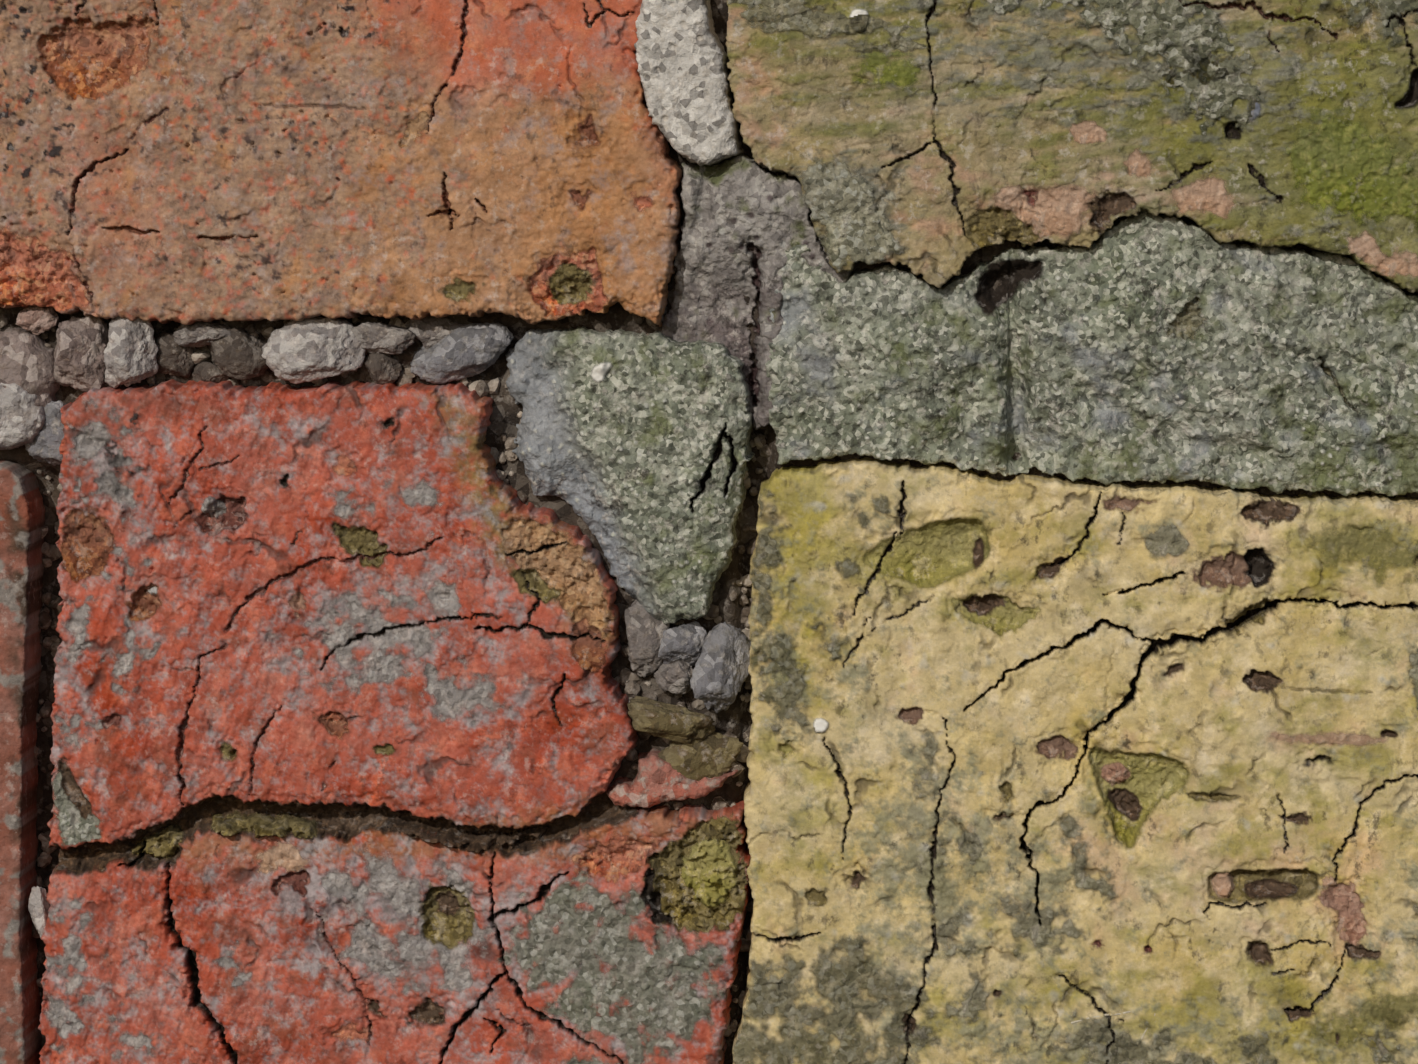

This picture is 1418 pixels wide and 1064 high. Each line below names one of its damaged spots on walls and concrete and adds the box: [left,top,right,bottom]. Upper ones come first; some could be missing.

crack [428,0,469,131]
crack [584,0,634,28]
crack [882,0,965,235]
crack [1179,0,1337,52]
crack [68,108,169,306]
crack [429,172,487,230]
crack [752,161,826,257]
crack [690,243,762,512]
crack [1051,492,1126,565]
crack [49,531,639,1064]
crack [823,737,852,860]
crack [904,571,1418,1064]